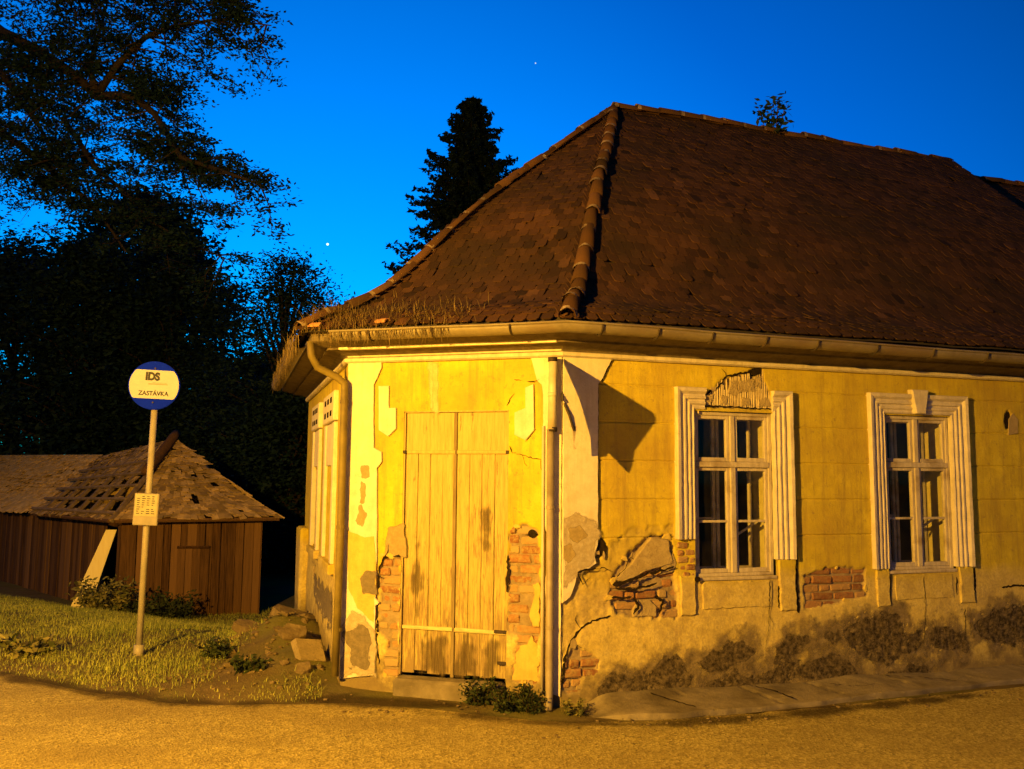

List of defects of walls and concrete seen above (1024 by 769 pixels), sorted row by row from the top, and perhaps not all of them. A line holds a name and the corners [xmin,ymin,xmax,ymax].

spalling [697,368,771,414]
peeling [347,465,407,678]
flaking render [508,524,541,686]
peeling [563,513,607,587]
flaking render [604,533,701,618]
flaking render [803,566,867,608]
flaking render [561,639,599,697]
crack [561,615,610,684]
leakage [592,592,1024,700]